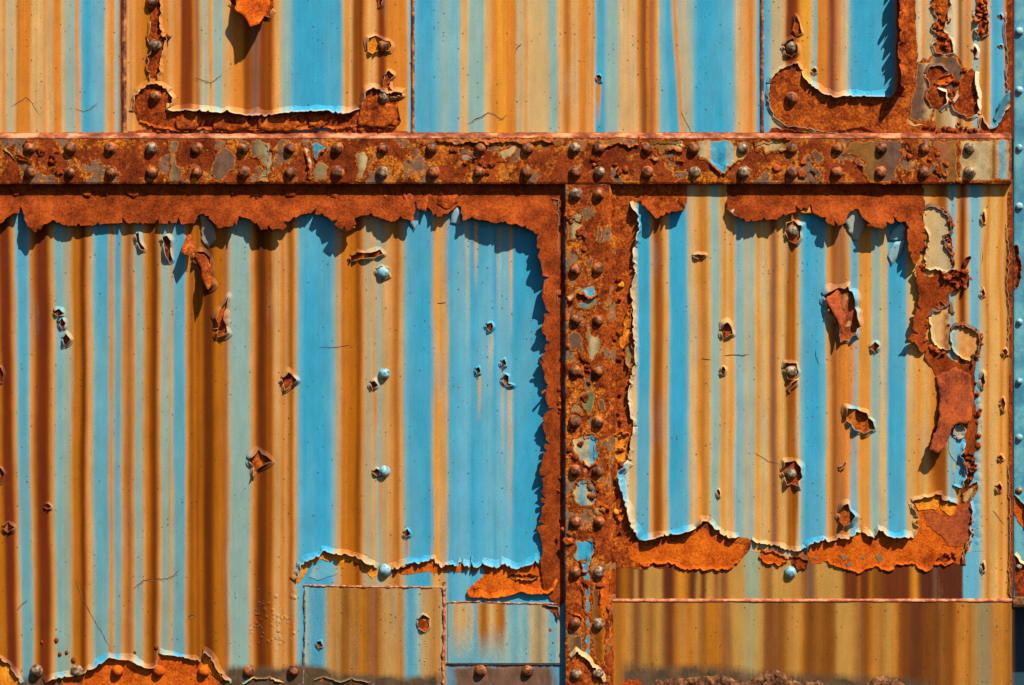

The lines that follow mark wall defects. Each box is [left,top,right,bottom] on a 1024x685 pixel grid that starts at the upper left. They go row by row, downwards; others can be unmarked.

peeling [128,0,408,134]
peeling [696,0,1013,184]
rust [0,213,56,685]
rust [71,223,94,672]
rust [109,215,231,675]
rust [249,217,296,670]
peeling [0,135,987,685]
rust [613,183,1013,685]